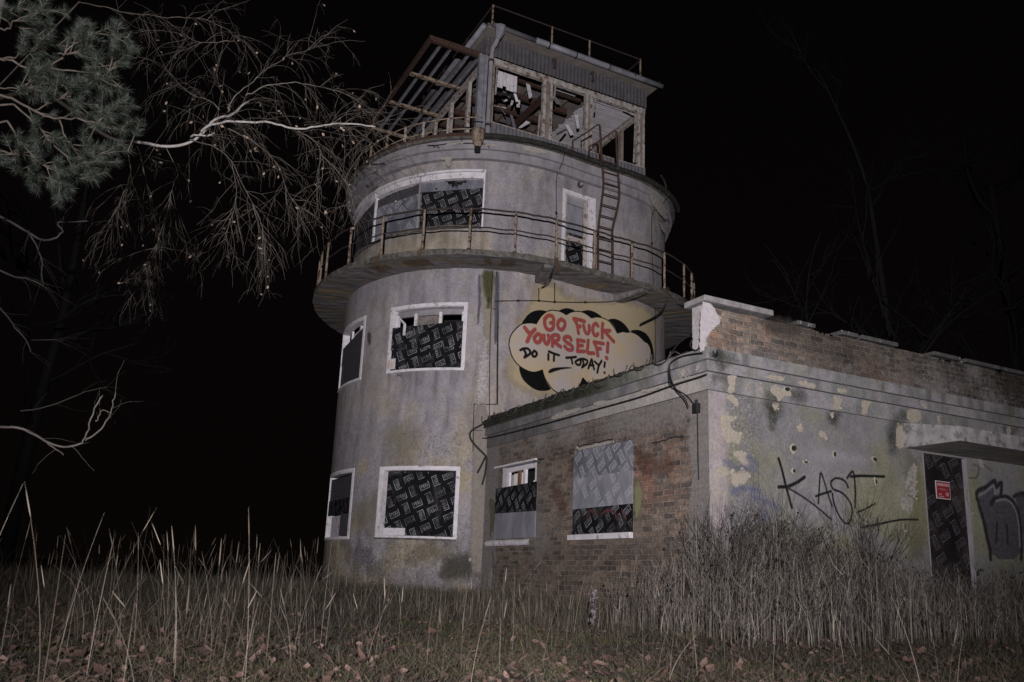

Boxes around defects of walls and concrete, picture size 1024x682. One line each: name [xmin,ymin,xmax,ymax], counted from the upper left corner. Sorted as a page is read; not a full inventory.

leakage [478,271,499,354]
peeling [642,302,722,393]
peeling [715,375,751,488]
peeling [759,375,816,410]
peeling [829,388,847,418]
peeling [895,403,926,449]
peeling [900,463,918,532]